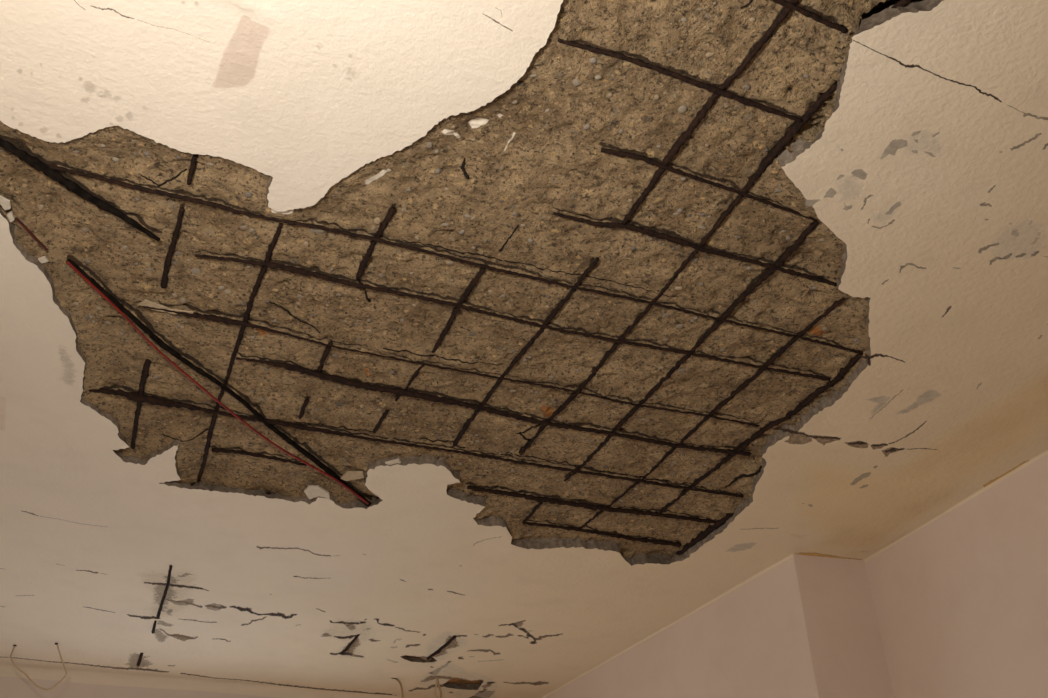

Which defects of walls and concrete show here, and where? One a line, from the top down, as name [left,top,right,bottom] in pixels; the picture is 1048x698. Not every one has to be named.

crack [74,0,134,19]
crack [851,39,1002,102]
peeling [880,124,952,162]
peeling [979,214,1048,266]
spalling [0,0,911,559]
crack [256,546,331,579]
spalling [86,565,217,642]
spalling [126,653,152,668]
spalling [314,608,380,660]
spalling [407,620,562,698]